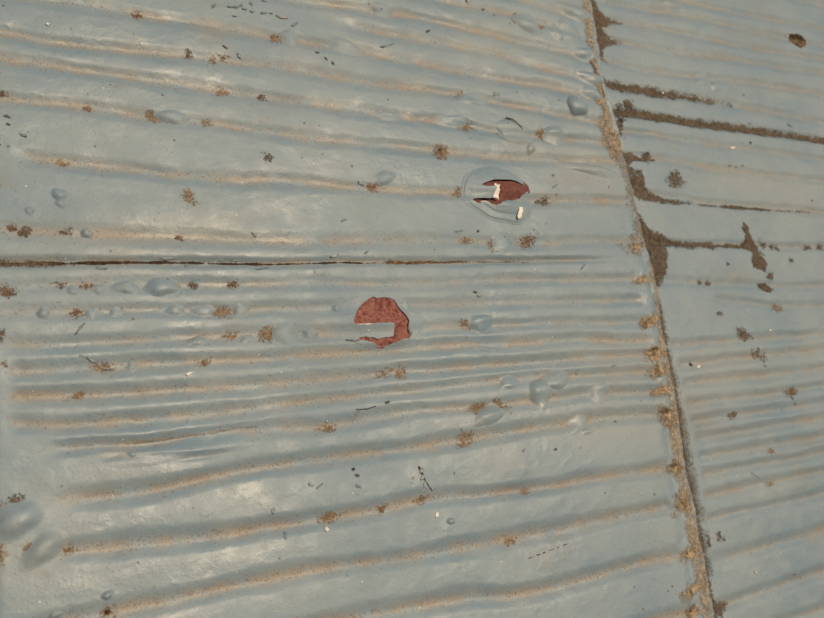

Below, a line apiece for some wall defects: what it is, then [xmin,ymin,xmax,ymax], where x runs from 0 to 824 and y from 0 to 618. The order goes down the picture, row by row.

peeling [460,166,533,225]
peeling [329,290,428,351]